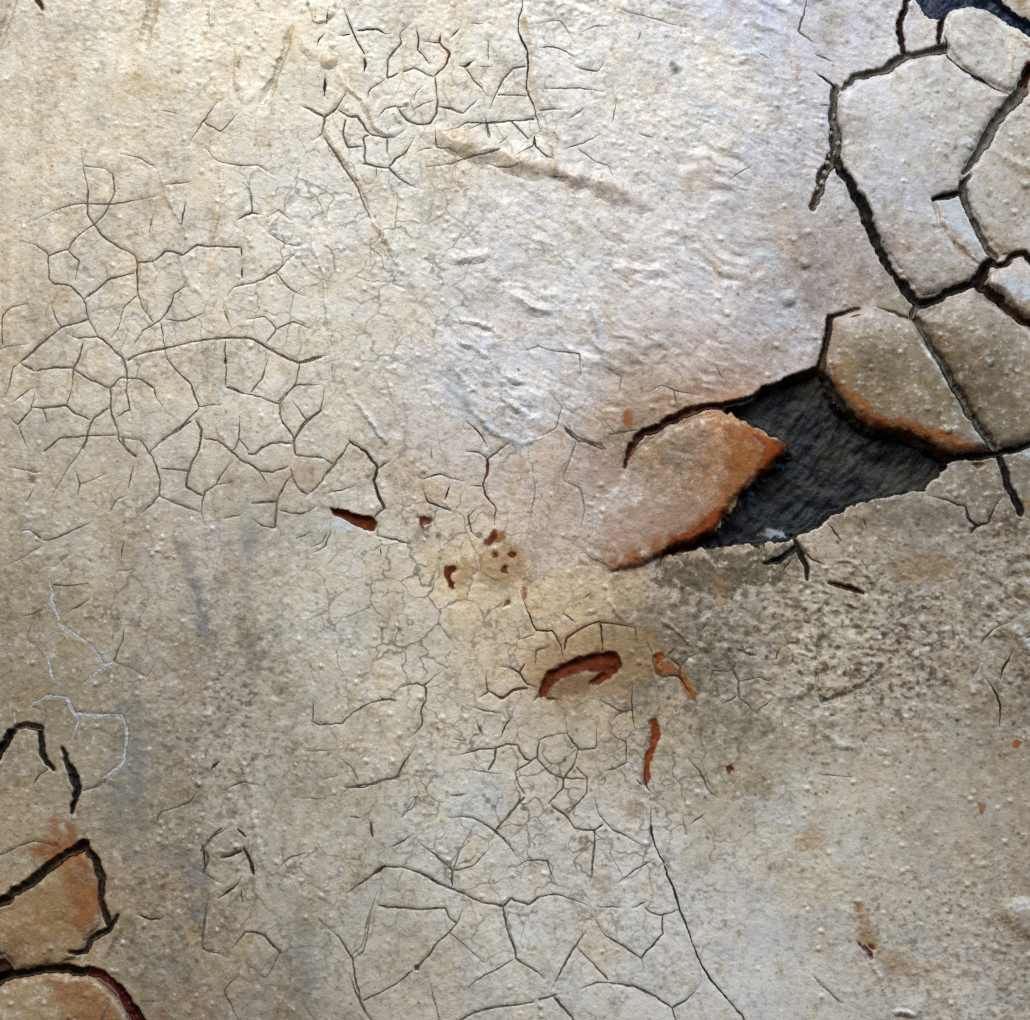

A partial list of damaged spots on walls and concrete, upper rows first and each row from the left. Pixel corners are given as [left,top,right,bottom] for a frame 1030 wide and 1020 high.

crack [525,345,581,369]
crack [0,102,410,813]
spalling [329,507,378,531]
corrosion [444,565,471,589]
crack [419,422,507,538]
corrosion [477,529,516,573]
spalling [584,372,956,570]
corrosion [654,652,696,699]
crack [295,593,780,1020]
corrosion [644,718,661,785]
crack [0,840,163,1020]
crack [200,827,303,1017]